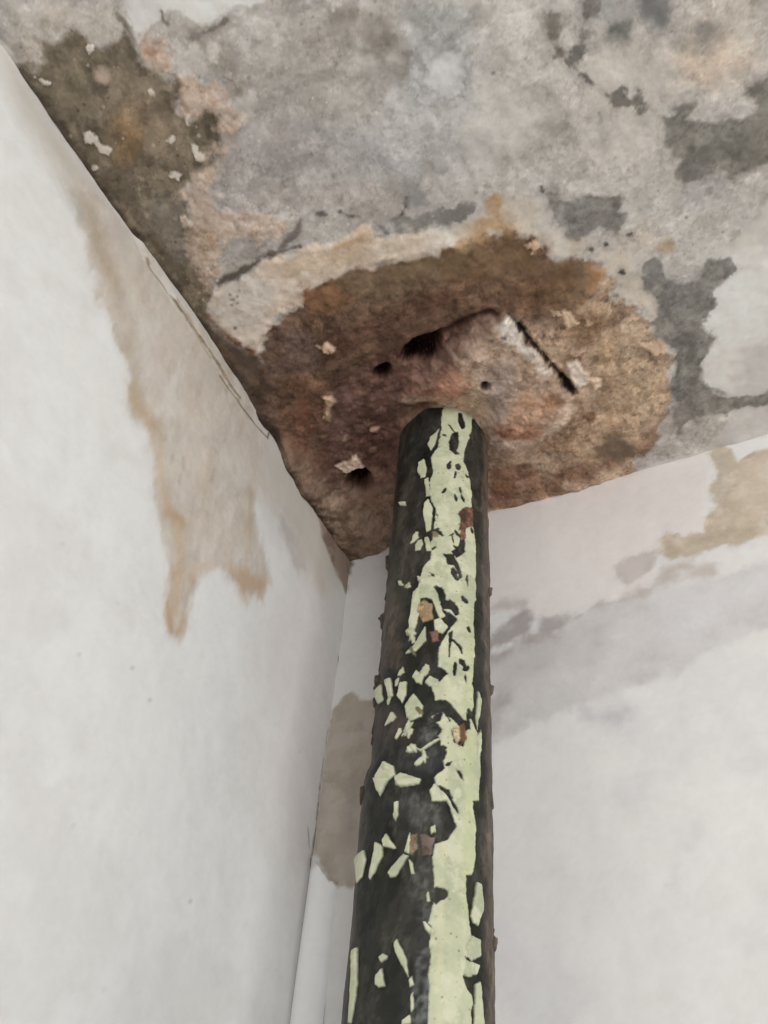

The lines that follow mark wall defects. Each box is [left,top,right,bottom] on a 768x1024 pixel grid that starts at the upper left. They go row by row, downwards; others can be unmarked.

peeling [0,0,768,352]
leakage [655,75,768,187]
leakage [10,12,311,649]
flaking render [313,307,504,505]
corrosion [204,187,675,513]
crack [438,308,578,399]
leakage [409,170,768,438]
peeling [373,576,450,803]
corrosion [457,506,474,541]
leakage [490,445,768,749]
peeling [354,833,416,884]
peeling [463,882,485,1024]